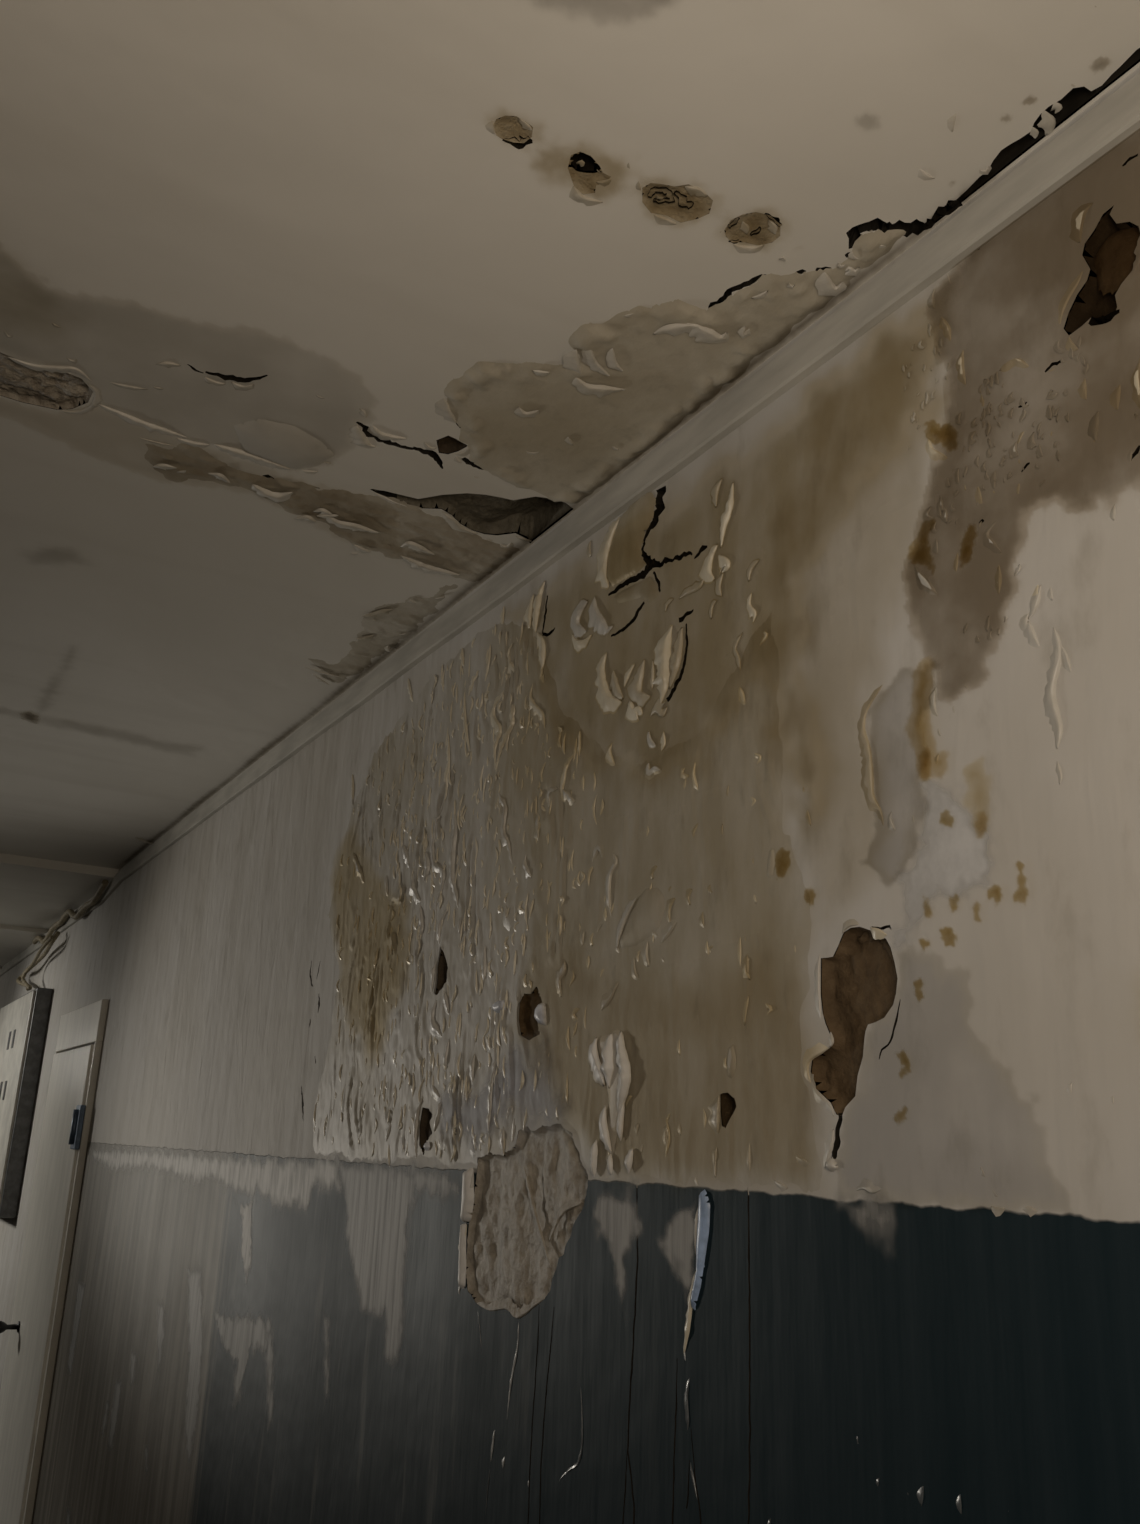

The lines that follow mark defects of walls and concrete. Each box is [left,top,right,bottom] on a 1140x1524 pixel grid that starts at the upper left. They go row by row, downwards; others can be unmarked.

hole [485,116,533,149]
hole [568,152,612,206]
hole [627,163,713,225]
spalling [720,212,782,253]
peeling [901,203,1140,596]
peeling [0,331,572,685]
crack [542,595,555,637]
crack [608,486,707,702]
peeling [857,685,914,831]
peeling [313,478,901,1352]
efflorescence [896,783,989,945]
water stain [185,1268,203,1460]